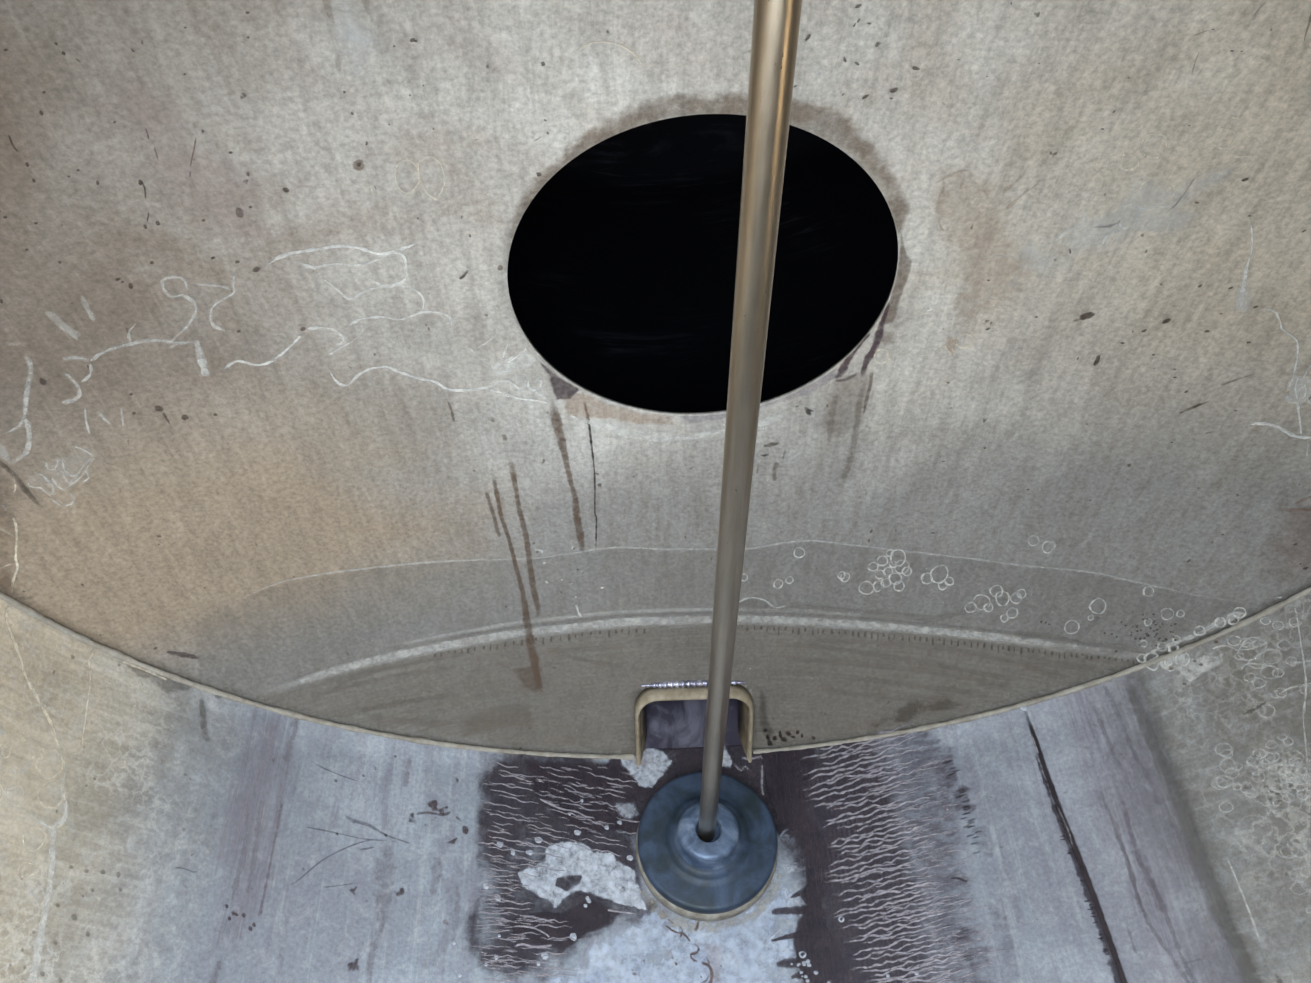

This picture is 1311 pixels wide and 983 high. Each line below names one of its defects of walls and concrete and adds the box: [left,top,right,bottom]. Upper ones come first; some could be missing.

corrosion [486,472,540,686]
damp [452,723,1002,983]